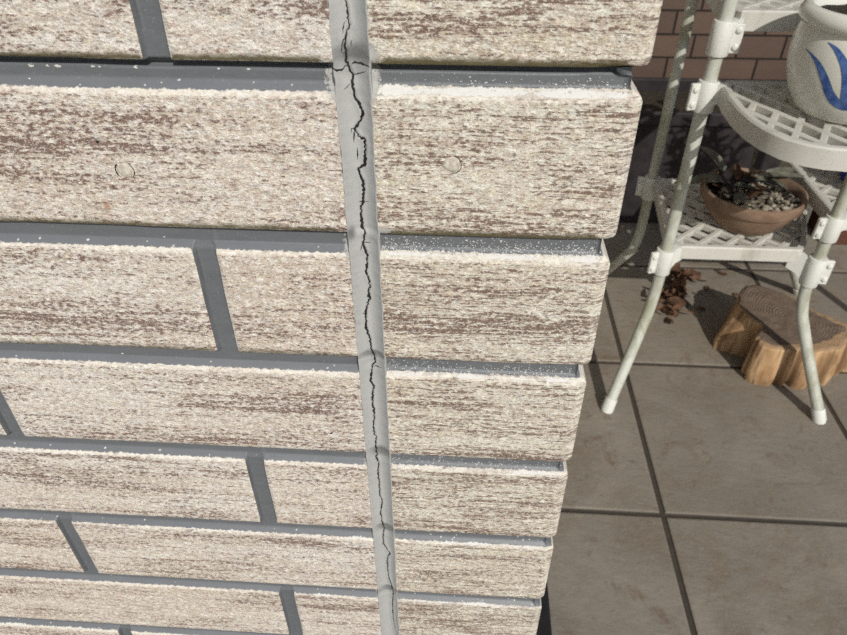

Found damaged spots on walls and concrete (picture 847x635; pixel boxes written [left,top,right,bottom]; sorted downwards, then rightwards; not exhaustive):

crack [332,0,395,628]